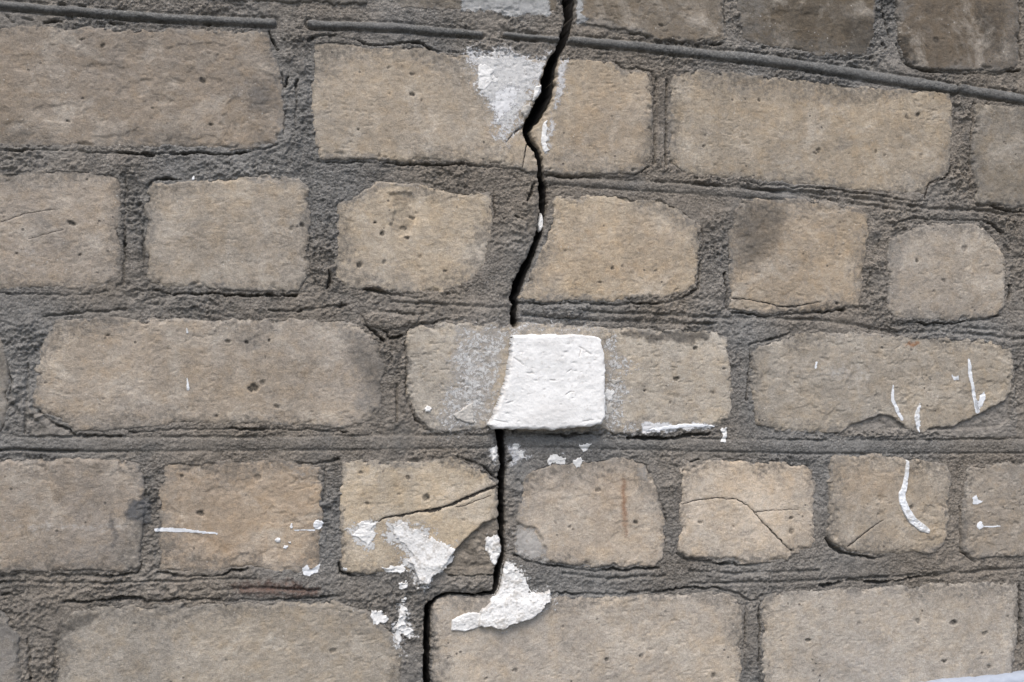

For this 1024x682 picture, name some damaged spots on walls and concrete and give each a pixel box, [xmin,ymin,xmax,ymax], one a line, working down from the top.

peeling [478,64,541,124]
crack [506,0,573,324]
crack [374,429,512,682]
peeling [345,517,558,657]